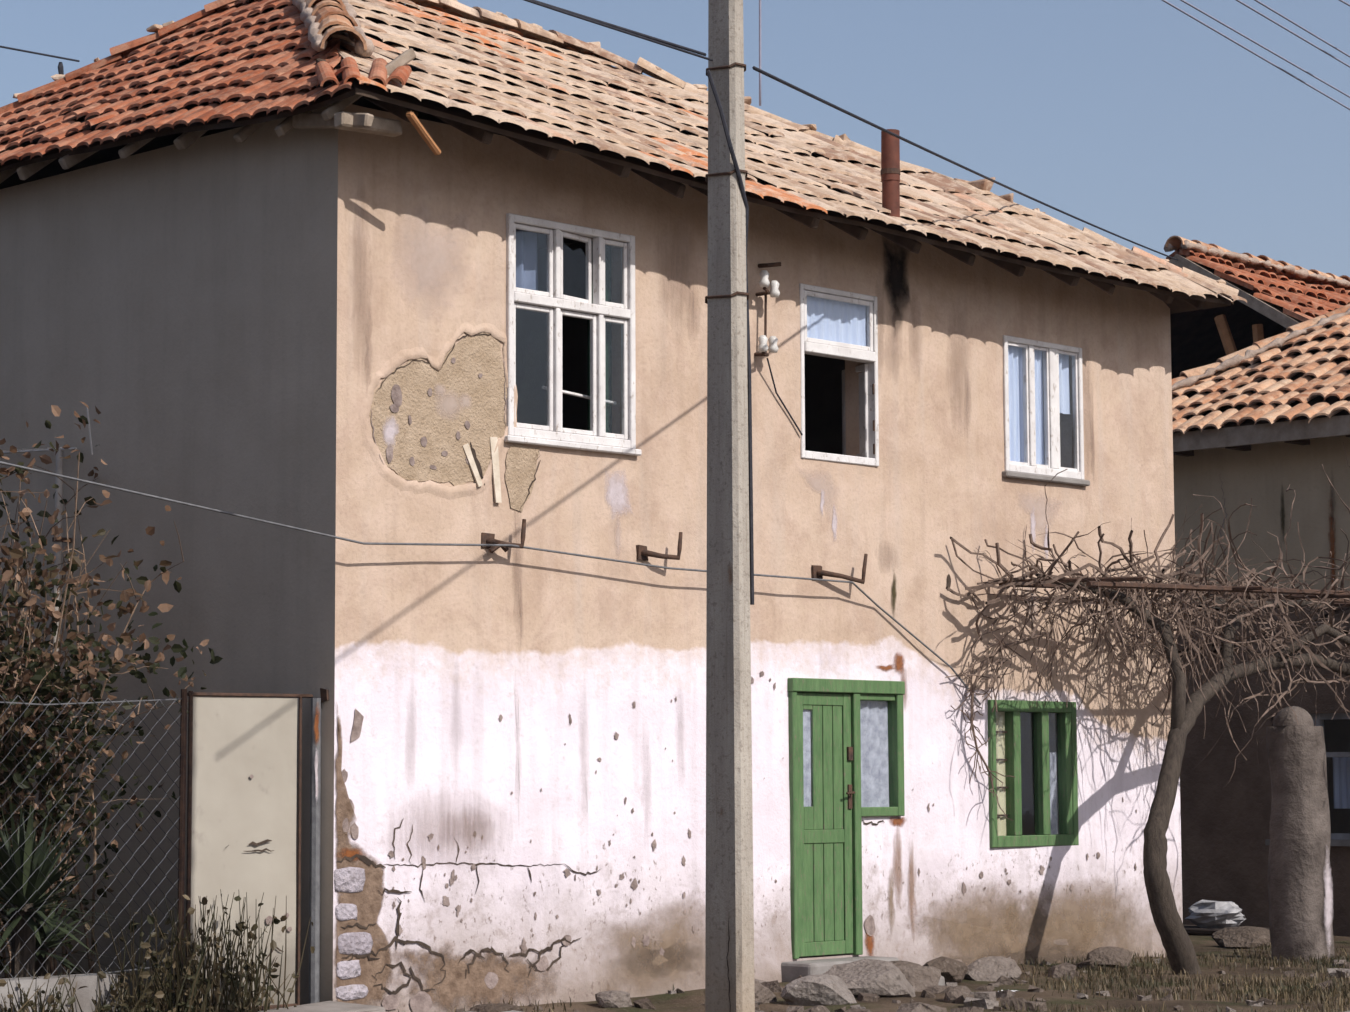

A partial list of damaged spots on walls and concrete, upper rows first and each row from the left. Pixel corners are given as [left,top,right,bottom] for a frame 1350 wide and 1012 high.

peeling [358,322,541,512]
corrosion [879,654,906,698]
spalling [334,709,582,1012]
crack [384,819,599,901]
peeling [597,873,641,915]
corrosion [889,848,914,921]
water stain [934,890,1126,964]